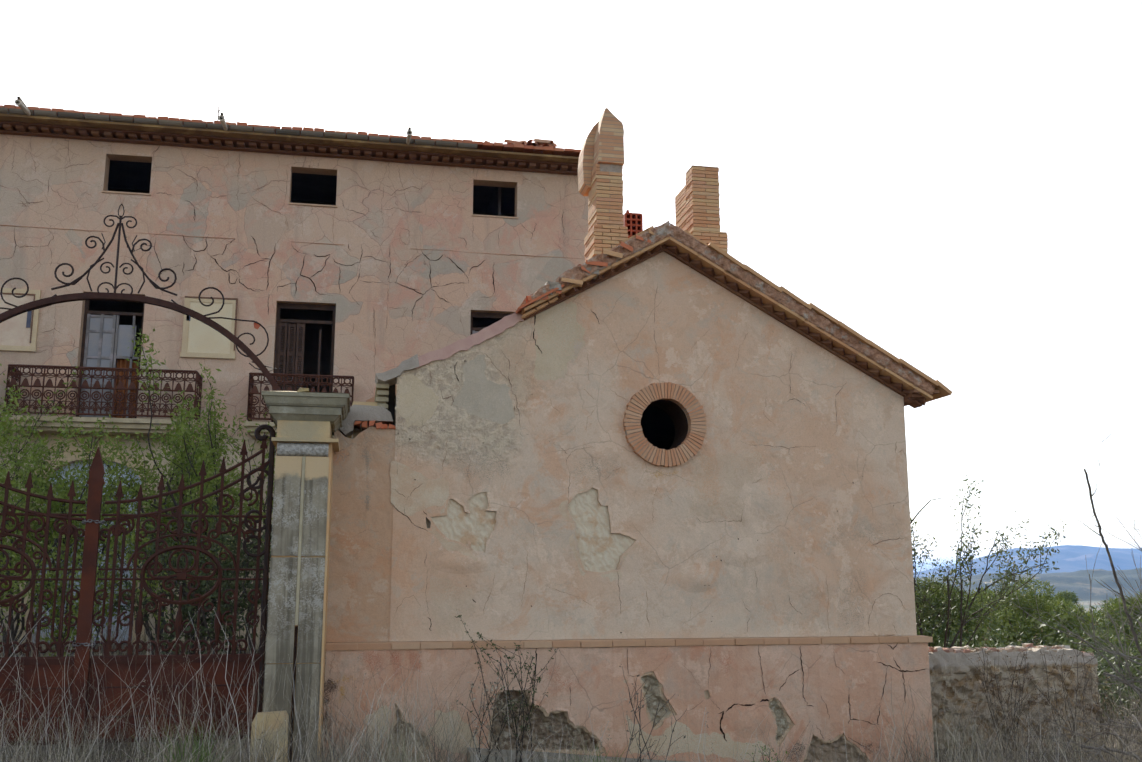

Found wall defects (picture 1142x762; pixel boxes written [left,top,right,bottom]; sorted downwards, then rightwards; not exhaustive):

crack [2,143,94,262]
crack [120,157,564,371]
peeling [395,374,439,429]
spalling [390,461,500,562]
spalling [559,486,638,582]
crack [627,572,925,746]
spalling [488,686,605,754]
peeling [624,670,796,762]
spalling [802,731,870,762]